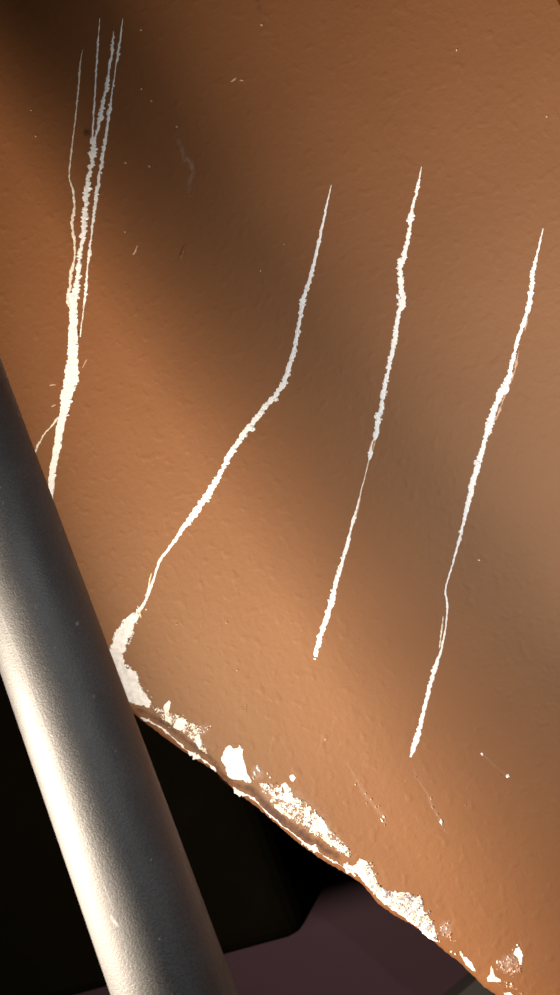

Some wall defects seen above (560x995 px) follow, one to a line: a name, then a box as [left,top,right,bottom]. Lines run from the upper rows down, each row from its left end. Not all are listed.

spalling [109,611,211,754]
spalling [221,745,475,971]
peeling [487,944,523,995]